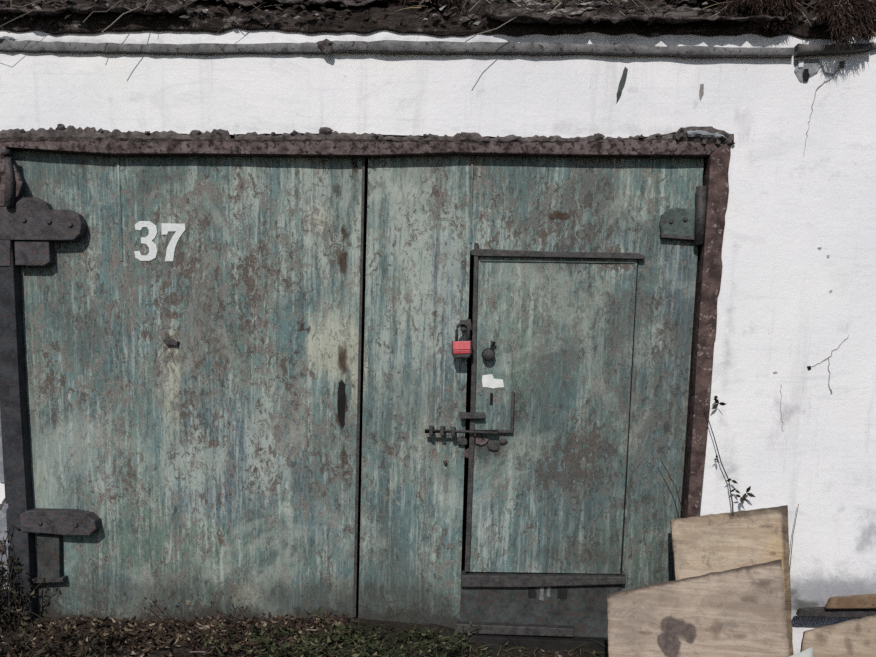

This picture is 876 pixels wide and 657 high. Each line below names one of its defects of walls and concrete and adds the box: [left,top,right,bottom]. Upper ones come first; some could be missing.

spalling [794,59,837,82]
crack [804,60,845,150]
rust [549,211,569,219]
rust [339,252,347,272]
rust [336,347,348,428]
crack [807,335,849,394]
spalling [0,498,11,620]